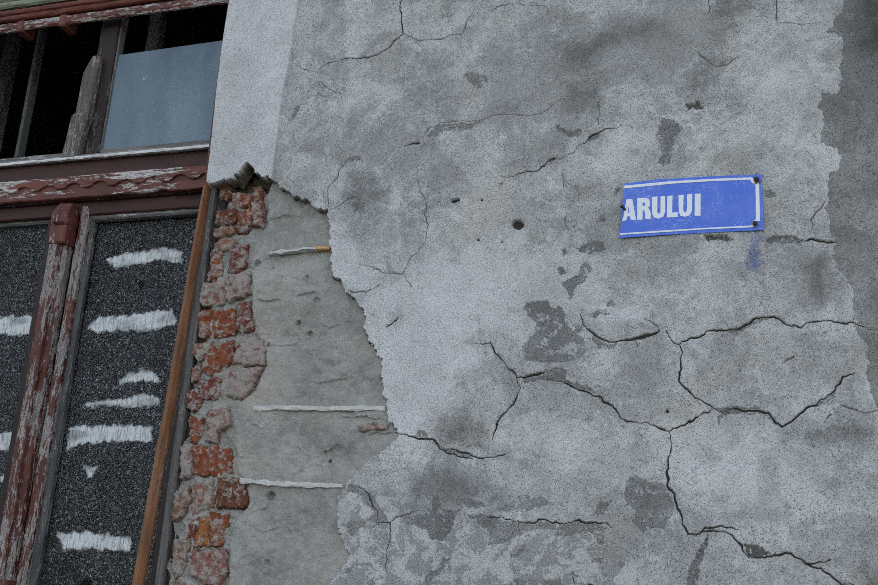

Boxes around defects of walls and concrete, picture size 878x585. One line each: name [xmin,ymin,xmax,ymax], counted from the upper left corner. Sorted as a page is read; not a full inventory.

crack [298,0,547,103]
crack [349,170,429,293]
crack [501,102,622,188]
peeling [657,119,681,166]
crack [804,202,835,244]
peeling [817,0,878,411]
spalling [167,175,398,585]
peeling [522,241,617,396]
crack [395,314,878,585]
crack [358,485,414,569]